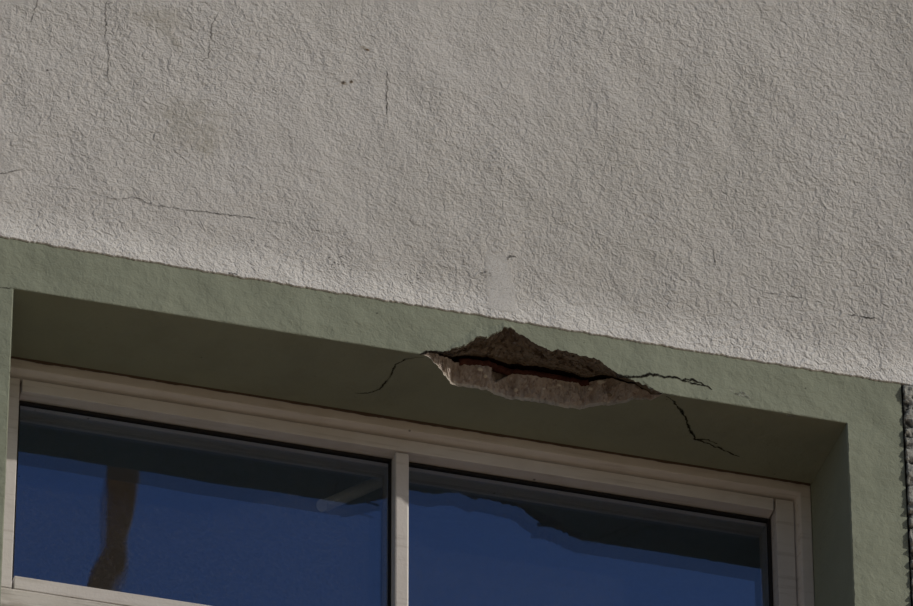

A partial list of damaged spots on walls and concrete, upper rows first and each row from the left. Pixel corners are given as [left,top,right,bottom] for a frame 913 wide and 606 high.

crack [358,350,453,394]
spalling [421,328,662,410]
crack [616,373,739,457]